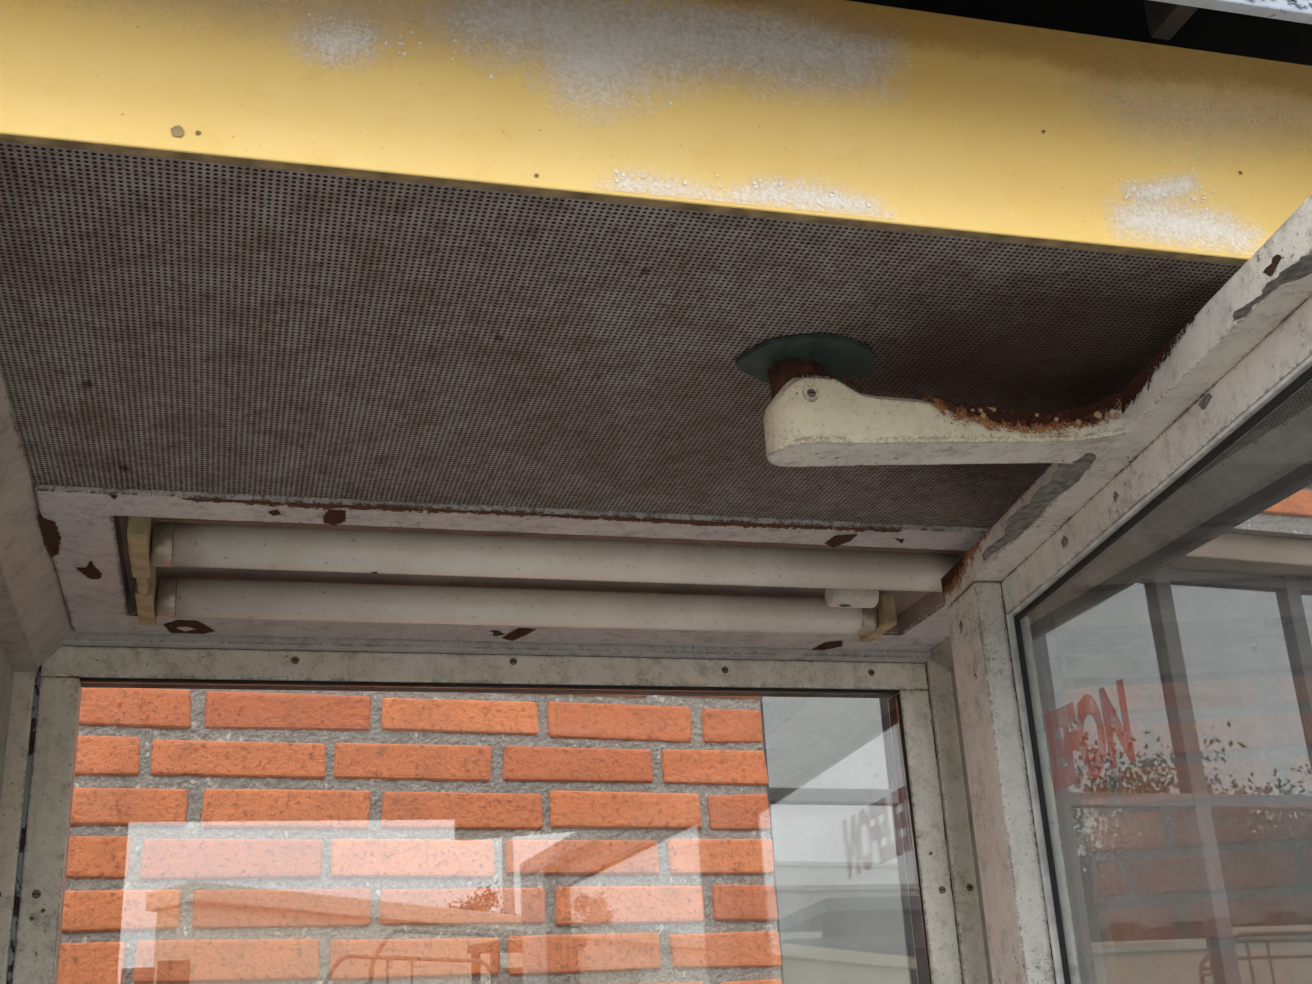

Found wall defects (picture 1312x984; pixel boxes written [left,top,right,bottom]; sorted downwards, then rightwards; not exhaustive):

peeling [1233,254,1312,321]
rust [898,290,1213,435]
rust [37,516,62,557]
rust [183,498,902,533]
rust [941,510,1008,603]
peeling [982,453,1096,562]